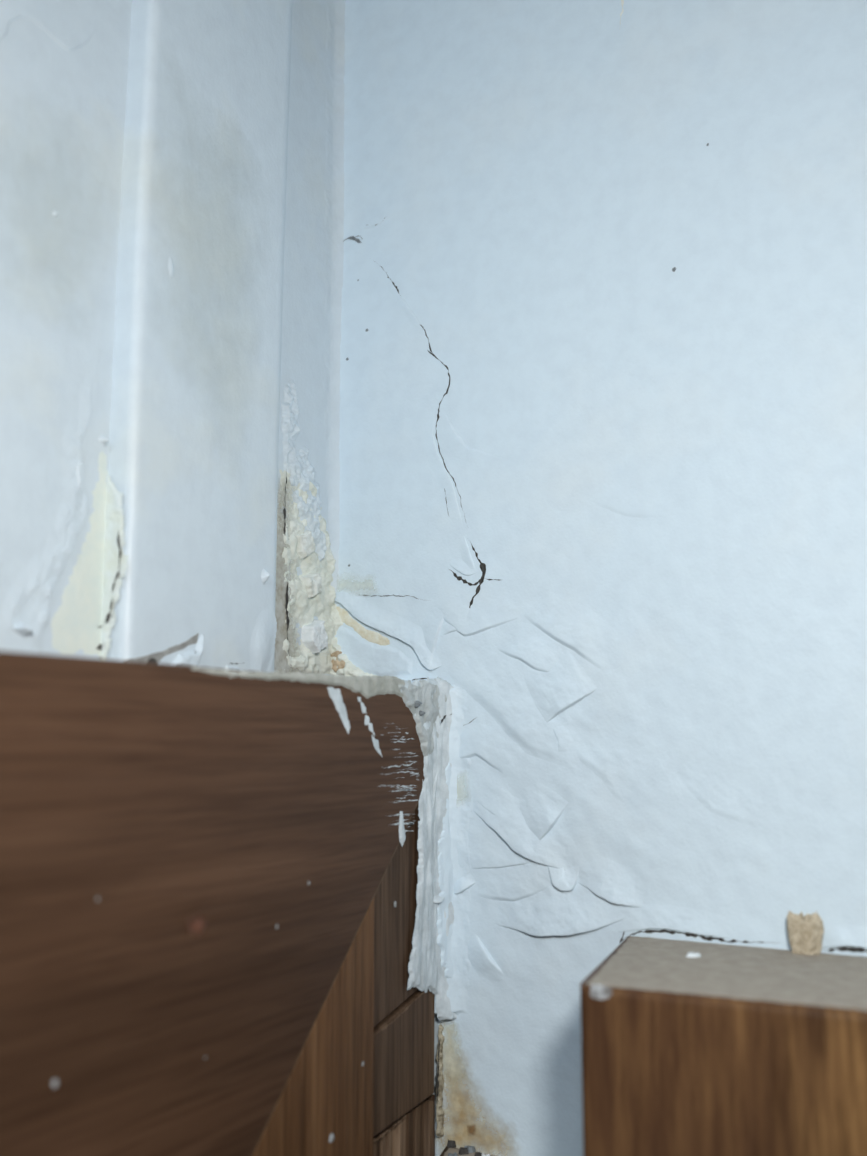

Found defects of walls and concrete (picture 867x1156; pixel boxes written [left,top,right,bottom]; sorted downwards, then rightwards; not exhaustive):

peeling [0,377,128,659]
crack [96,531,121,658]
peeling [125,633,205,667]
flaking render [276,378,442,677]
crack [343,217,499,608]
rust [440,1026,504,1154]